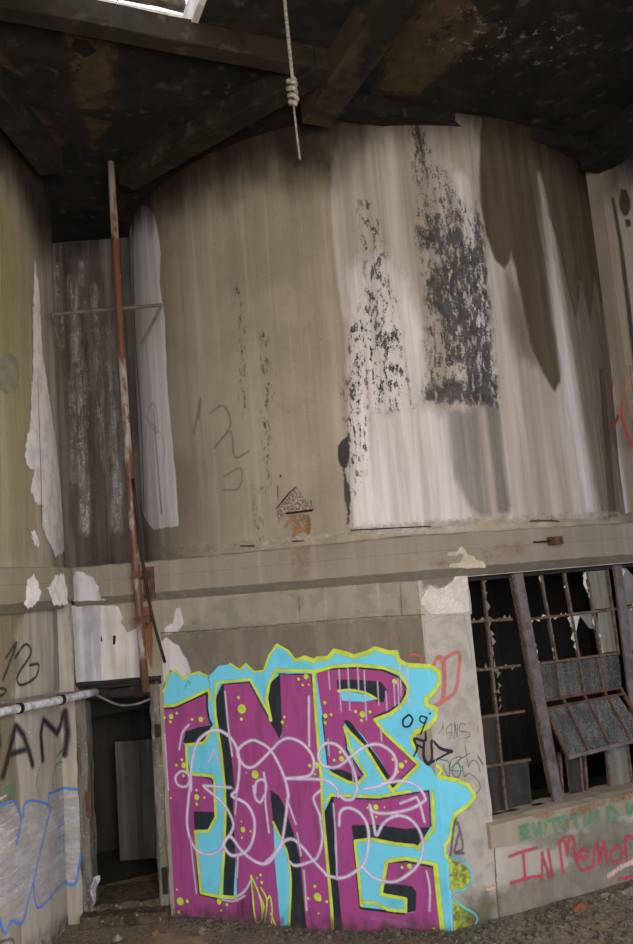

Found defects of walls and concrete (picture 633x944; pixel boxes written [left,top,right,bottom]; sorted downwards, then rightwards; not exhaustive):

damp [60,32,118,155]
damp [375,0,598,96]
damp [25,260,64,558]
damp [56,262,121,534]
damp [155,118,633,553]
peeling [14,571,140,944]
flaking render [421,546,498,931]
peeling [607,859,633,879]